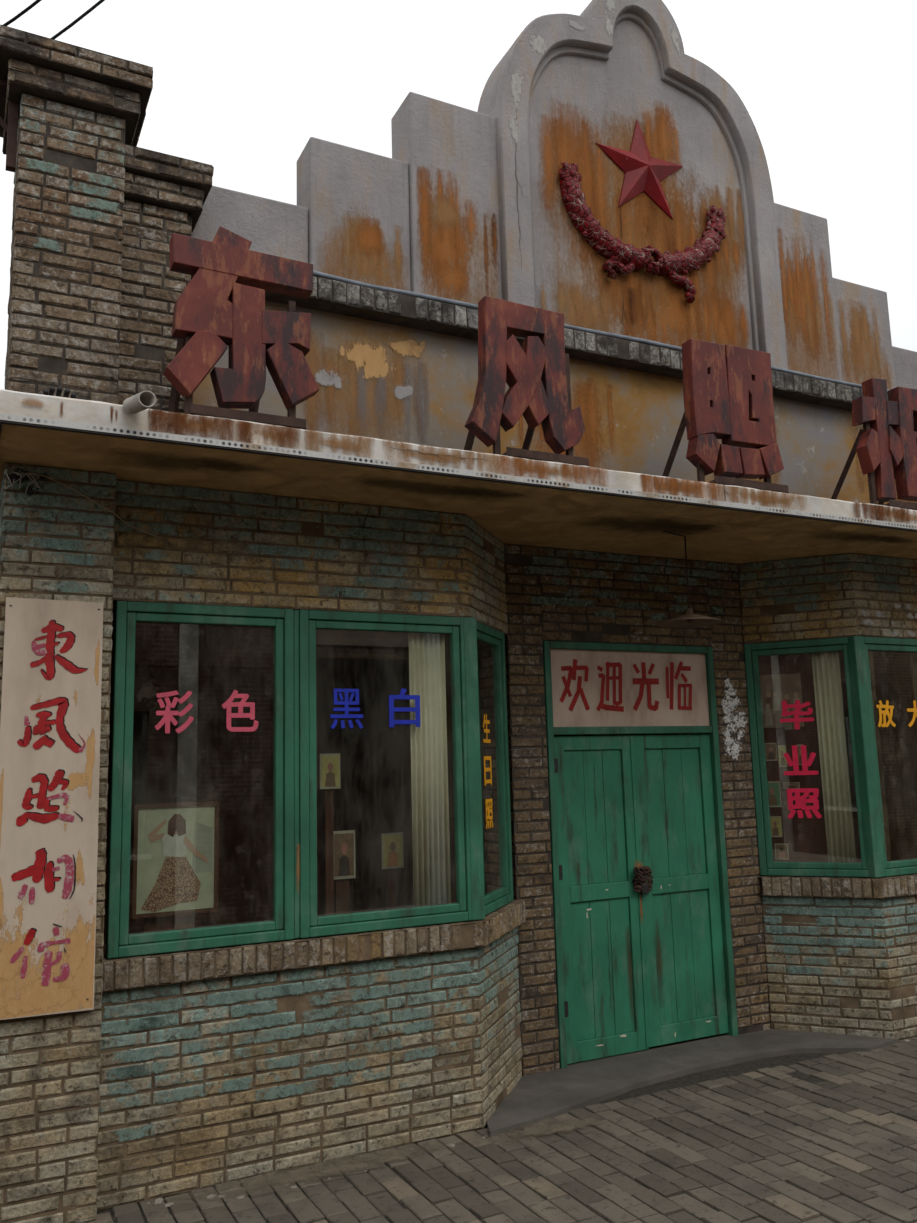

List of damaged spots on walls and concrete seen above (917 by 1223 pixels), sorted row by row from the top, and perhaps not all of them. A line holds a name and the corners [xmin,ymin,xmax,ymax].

rust [324,220,403,290]
rust [417,168,497,303]
rust [541,107,748,346]
rust [779,229,891,390]
rust [148,334,614,486]
damp [378,482,511,496]